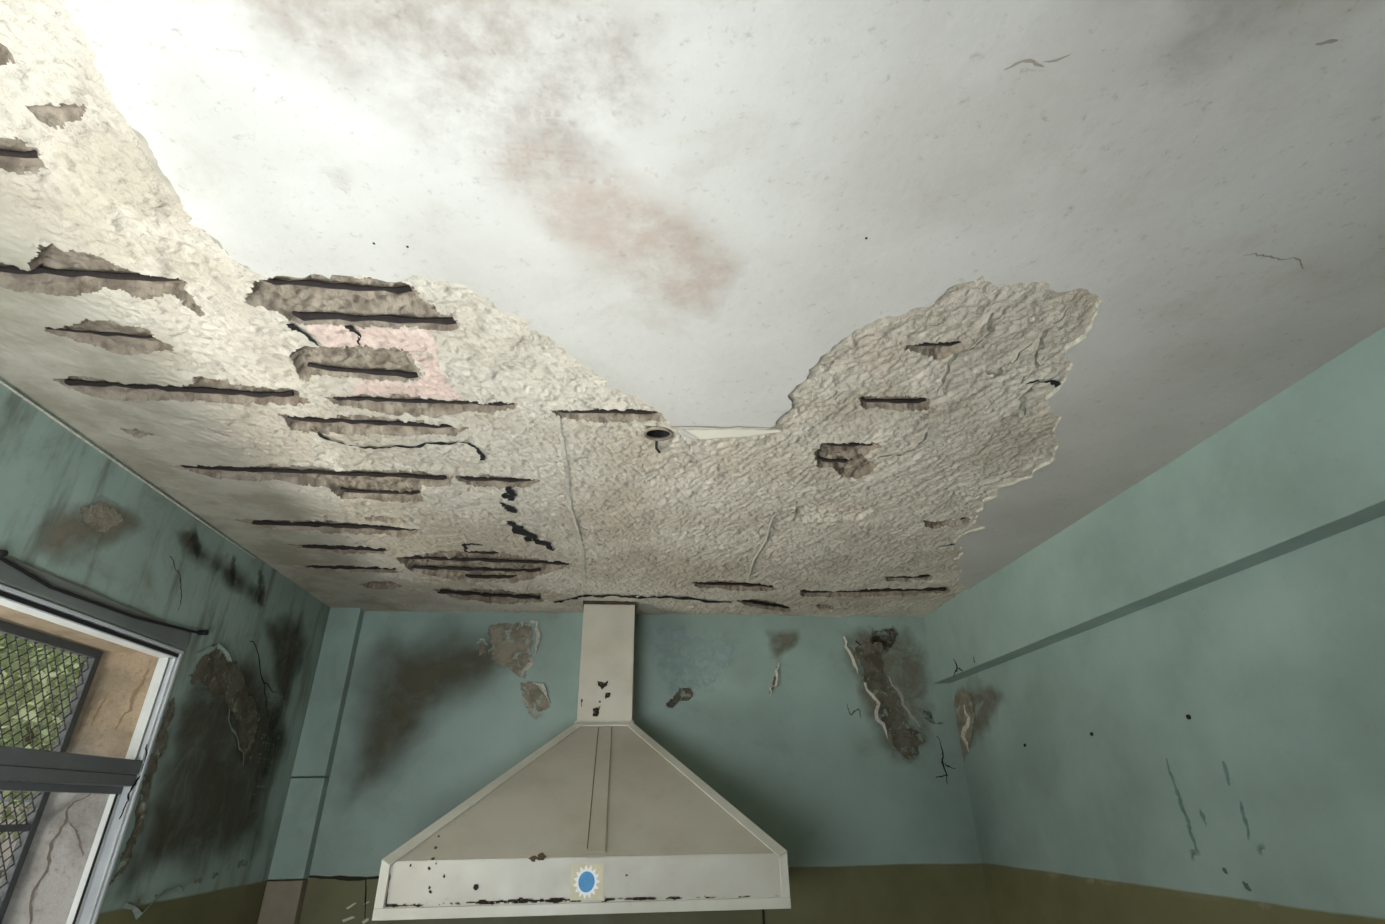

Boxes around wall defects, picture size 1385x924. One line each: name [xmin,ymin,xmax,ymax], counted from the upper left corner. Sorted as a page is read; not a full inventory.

spalling [0,0,1100,720]
water stain [130,624,302,879]
peeling [843,636,925,759]
peeling [954,689,975,761]